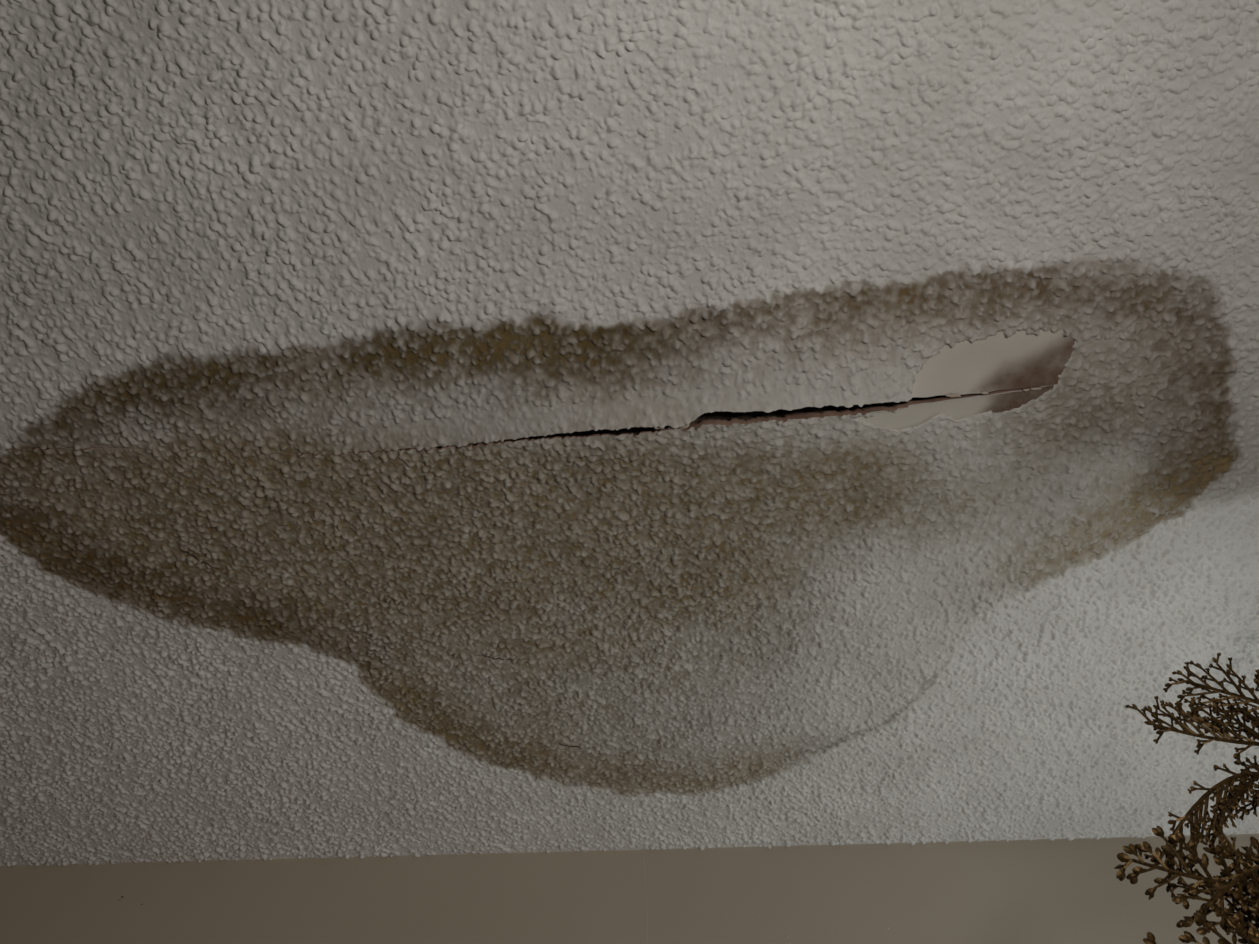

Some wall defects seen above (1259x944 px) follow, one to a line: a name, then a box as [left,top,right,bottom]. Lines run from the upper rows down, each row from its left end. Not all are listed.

damp [816,269,1194,326]
crack [0,384,1060,457]
peeling [858,329,1075,432]
damp [0,318,924,777]
damp [1038,451,1233,578]